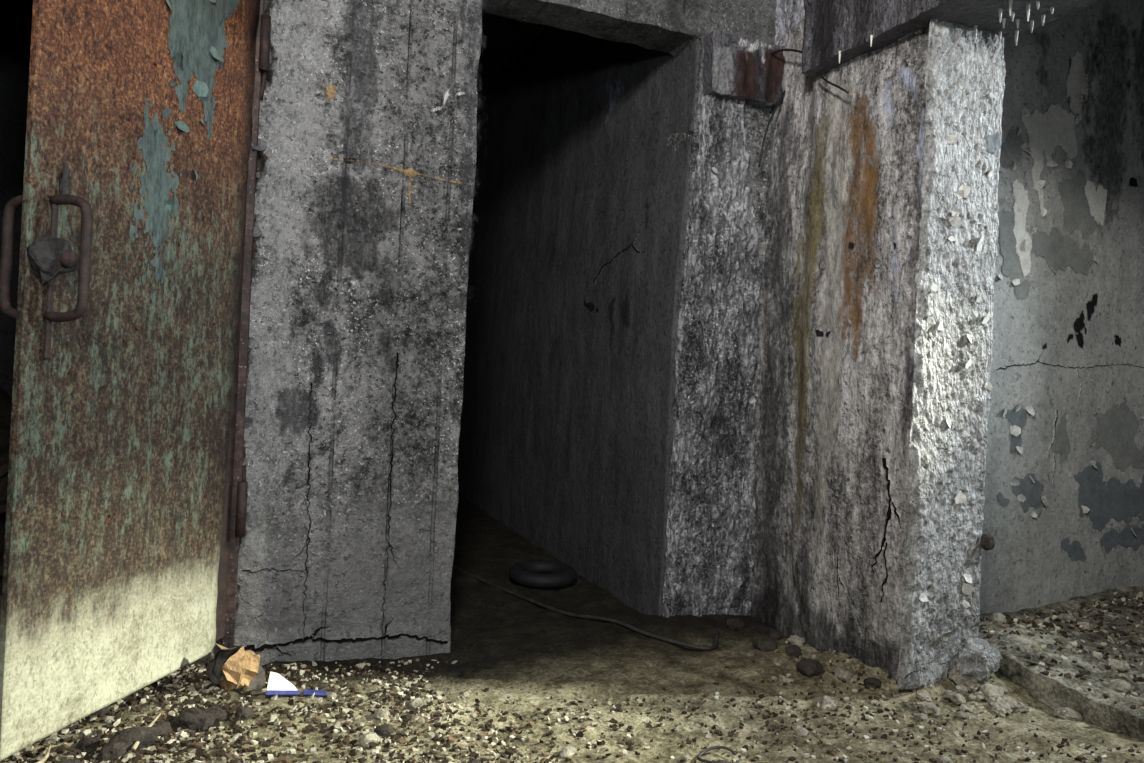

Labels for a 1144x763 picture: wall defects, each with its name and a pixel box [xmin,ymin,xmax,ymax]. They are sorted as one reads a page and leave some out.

peeling [175,118,205,133]
peeling [193,80,209,97]
corrosion [729,47,785,101]
corrosion [839,98,878,355]
crack [234,353,448,655]
crack [836,555,846,596]
crack [872,458,902,603]
spalling [897,19,1107,690]
crack [997,340,1144,485]
peeling [1052,402,1144,557]